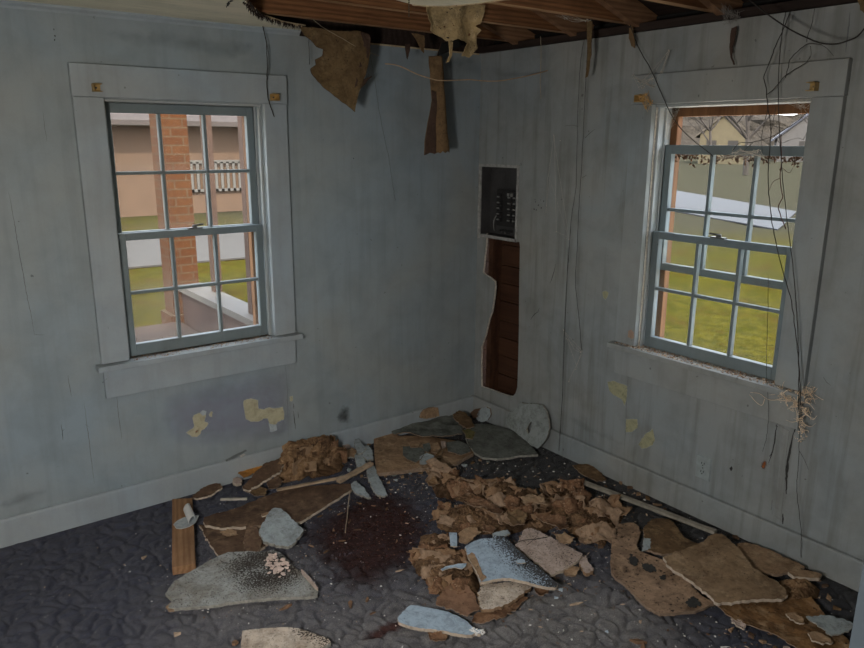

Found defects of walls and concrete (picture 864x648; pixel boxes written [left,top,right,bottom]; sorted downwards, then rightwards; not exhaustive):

peeling [186,410,213,438]
peeling [243,396,293,432]